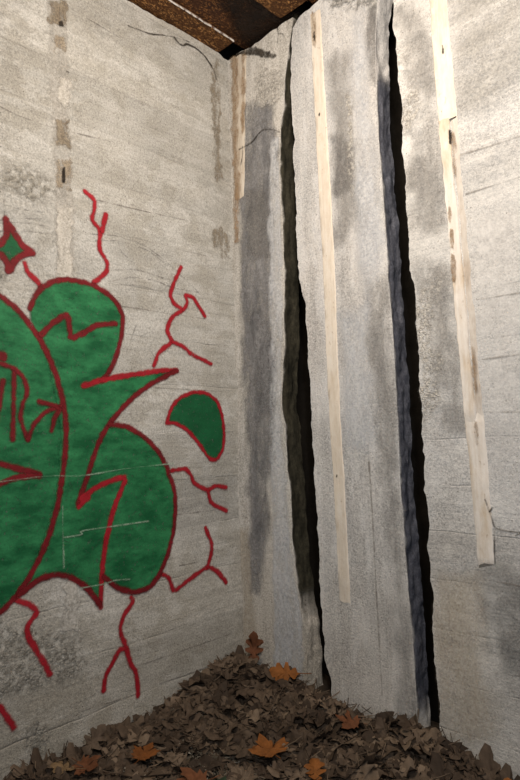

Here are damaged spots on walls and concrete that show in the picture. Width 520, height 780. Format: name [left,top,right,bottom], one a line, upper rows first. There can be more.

crack [128,25,217,79]
leakage [240,68,303,680]
crack [296,258,331,678]
crack [388,18,440,723]